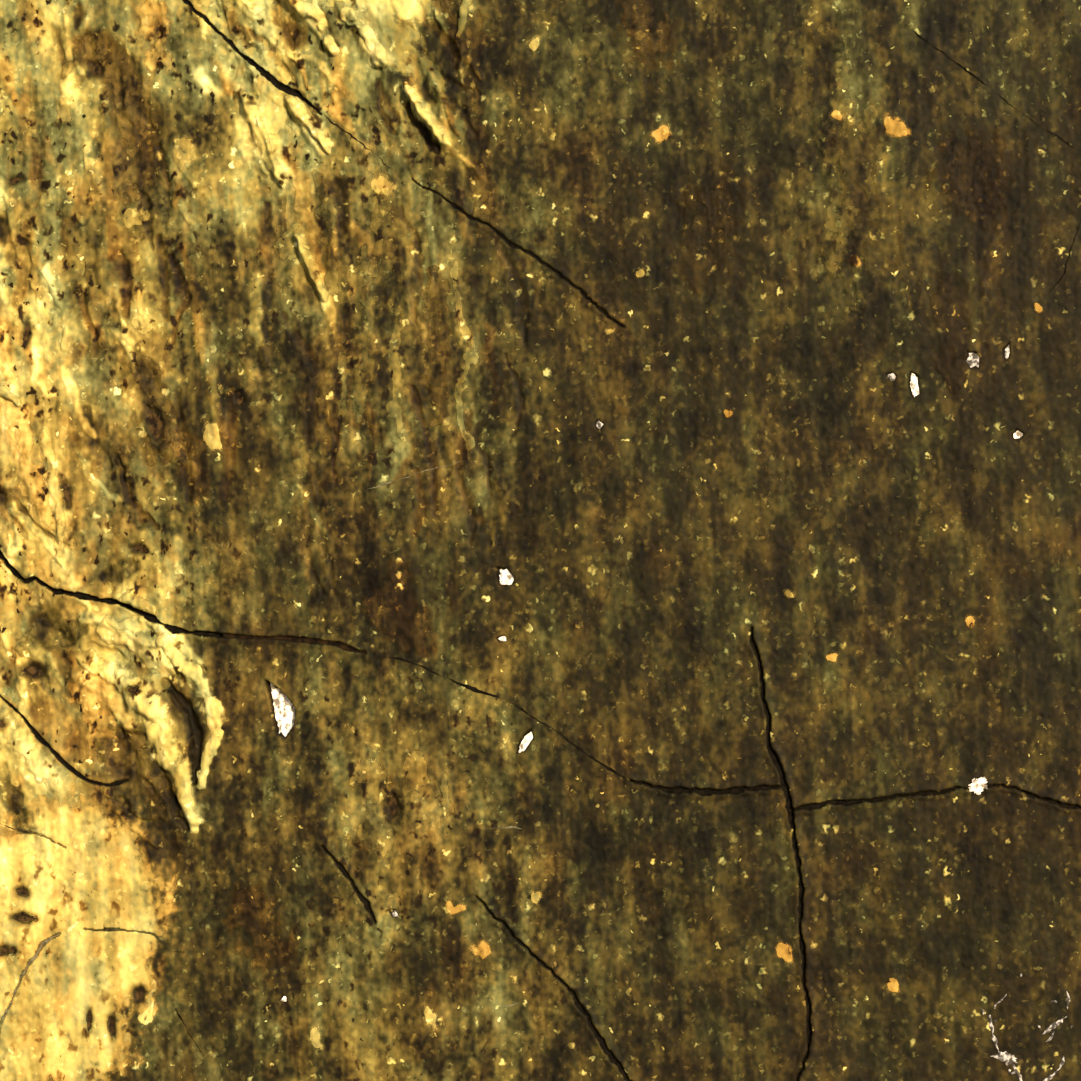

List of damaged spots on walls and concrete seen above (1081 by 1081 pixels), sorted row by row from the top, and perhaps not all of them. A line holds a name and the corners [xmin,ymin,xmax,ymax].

crack [184,0,624,327]
leakage [440,0,492,249]
leakage [680,165,743,295]
leakage [809,20,887,316]
leakage [929,271,975,400]
peeling [271,683,296,737]
crack [0,550,1081,1081]